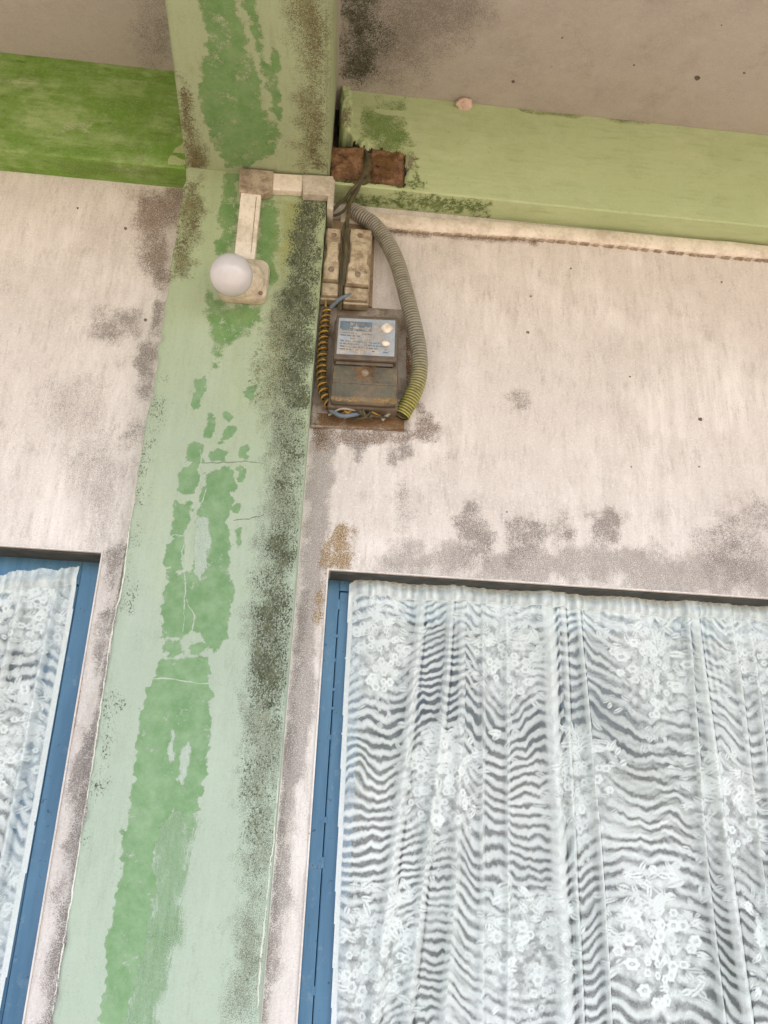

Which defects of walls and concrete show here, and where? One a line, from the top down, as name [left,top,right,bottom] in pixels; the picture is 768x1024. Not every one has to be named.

peeling [197,0,283,255]
spalling [330,108,415,188]
leakage [280,0,500,174]
peeling [256,197,281,289]
leakage [28,0,210,1024]
peeling [96,291,263,1024]
crack [150,677,221,685]
crack [168,453,260,632]
leakage [218,196,372,1024]
corrosion [309,518,360,626]
leakage [372,480,768,597]
spalling [257,778,279,1009]